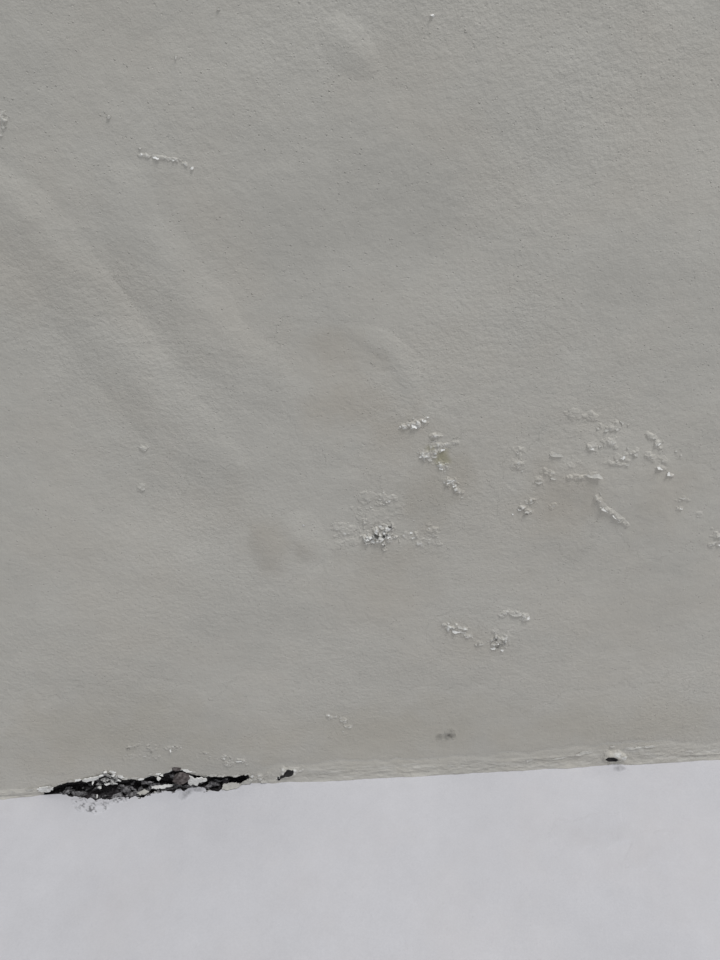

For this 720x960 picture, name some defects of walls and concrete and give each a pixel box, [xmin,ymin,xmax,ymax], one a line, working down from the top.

peeling [398,416,465,498]
peeling [359,517,402,551]
peeling [441,609,530,652]
spalling [0,741,720,801]